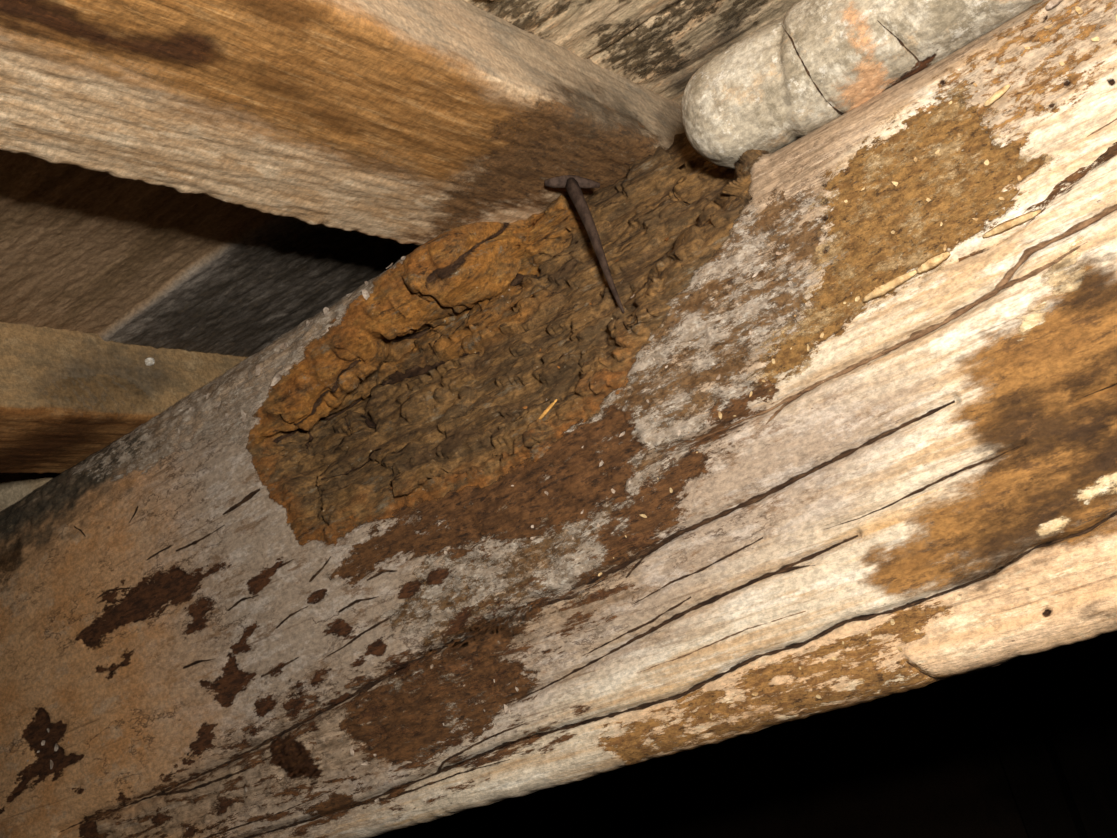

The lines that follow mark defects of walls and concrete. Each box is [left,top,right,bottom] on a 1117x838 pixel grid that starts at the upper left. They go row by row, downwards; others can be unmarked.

water stain [0,0,549,189]
water stain [127,228,406,357]
crack [425,222,509,289]
crack [510,273,537,286]
crack [637,118,1117,467]
crack [273,308,479,480]
water stain [862,260,1117,595]
crack [59,401,1117,838]